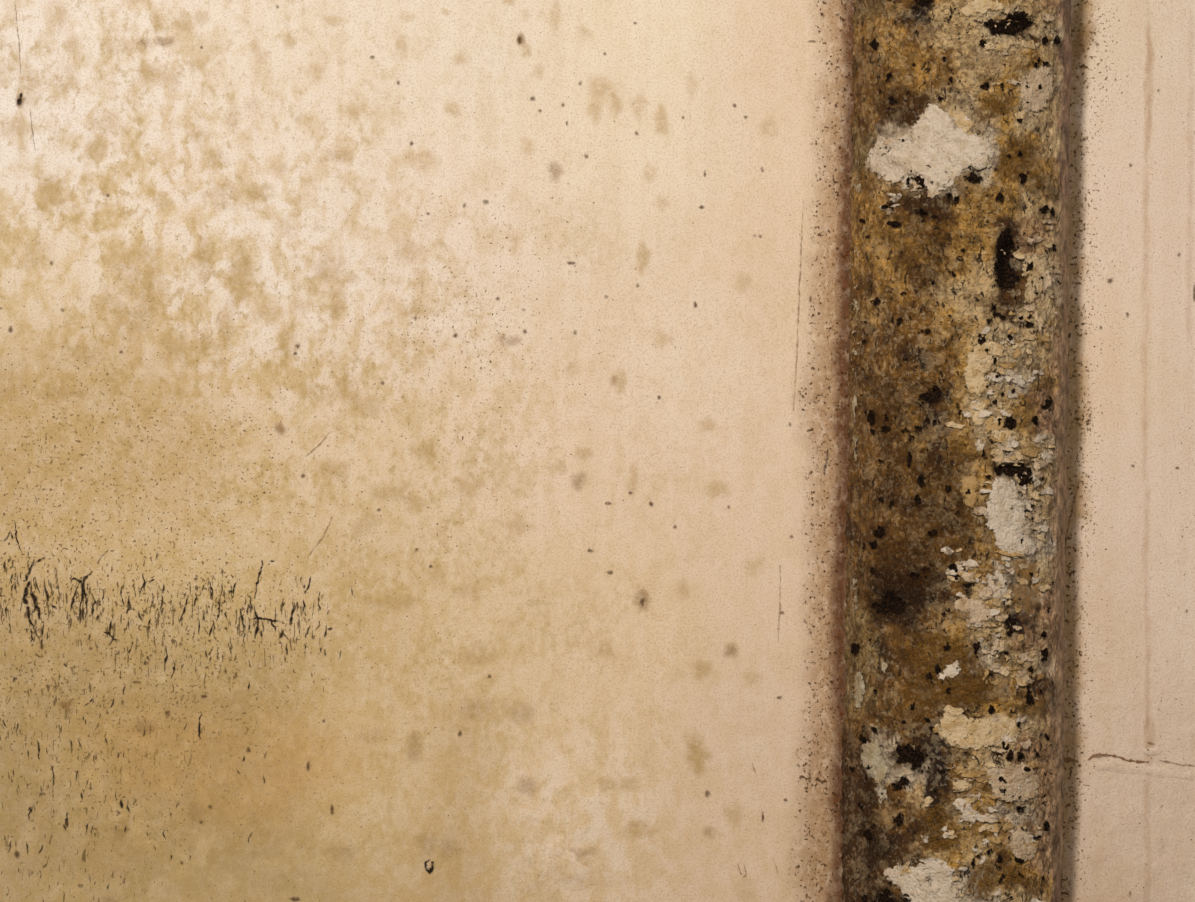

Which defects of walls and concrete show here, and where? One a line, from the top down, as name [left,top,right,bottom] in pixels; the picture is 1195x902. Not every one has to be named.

spalling [878,70,909,109]
peeling [864,76,1023,227]
damp [784,0,854,902]
damp [1062,0,1098,849]
peeling [849,205,1063,902]
rust [900,635,989,721]
crack [1064,742,1191,766]
rust [918,805,957,850]
rust [967,859,1022,898]